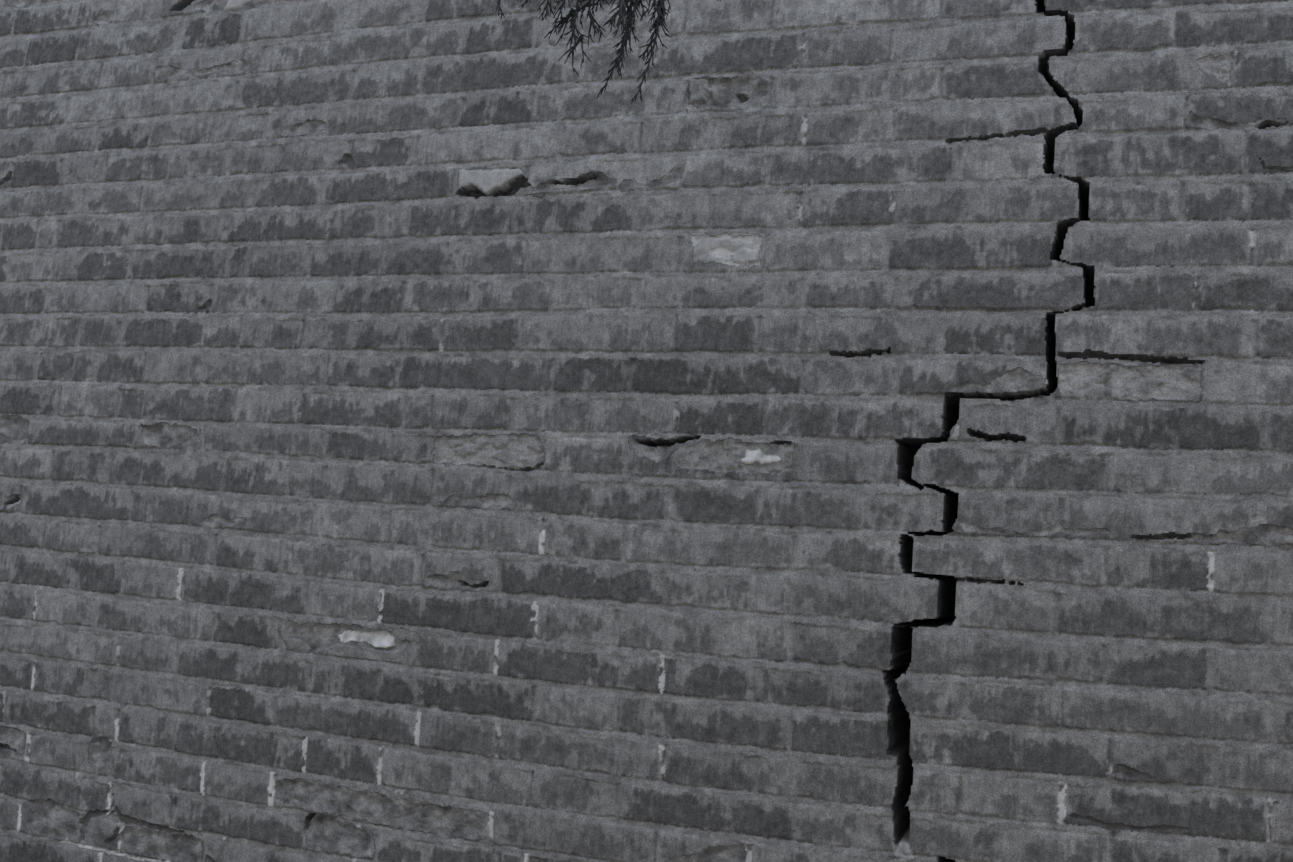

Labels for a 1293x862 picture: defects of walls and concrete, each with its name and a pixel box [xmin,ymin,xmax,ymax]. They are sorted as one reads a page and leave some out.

spalling [193,0,278,15]
spalling [684,73,773,113]
spalling [455,163,686,199]
peeling [948,361,1203,403]
crack [881,0,1206,845]
peeling [432,433,546,472]
peeling [627,433,795,476]
spalling [277,620,421,663]
crack [937,854,956,862]